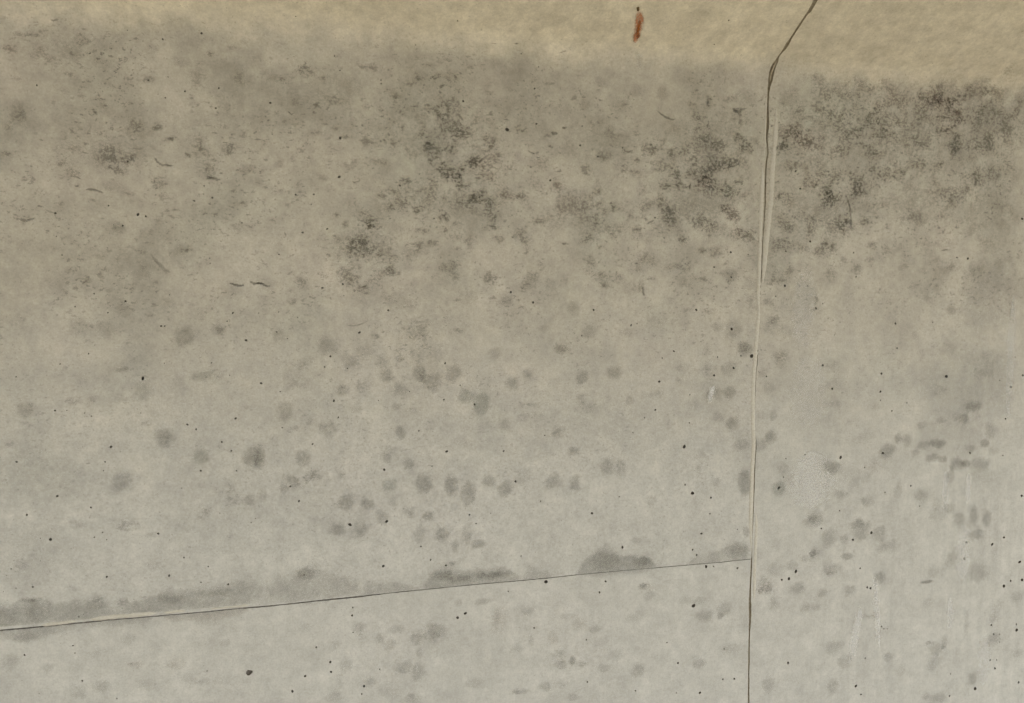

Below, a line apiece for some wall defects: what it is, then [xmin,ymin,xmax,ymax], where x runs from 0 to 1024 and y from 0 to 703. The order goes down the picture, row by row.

crack [0,0,818,703]
corrosion [634,7,643,42]